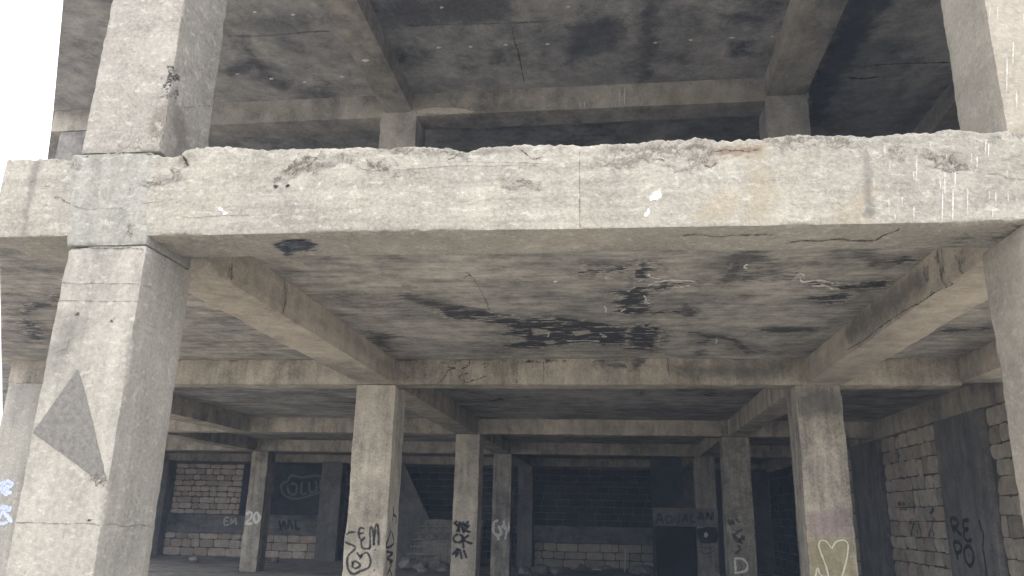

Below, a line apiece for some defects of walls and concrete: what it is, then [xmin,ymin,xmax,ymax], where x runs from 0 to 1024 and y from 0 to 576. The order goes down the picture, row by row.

crack [683,228,900,243]
leakage [399,259,701,367]
leakage [714,242,962,340]
crack [437,360,489,384]